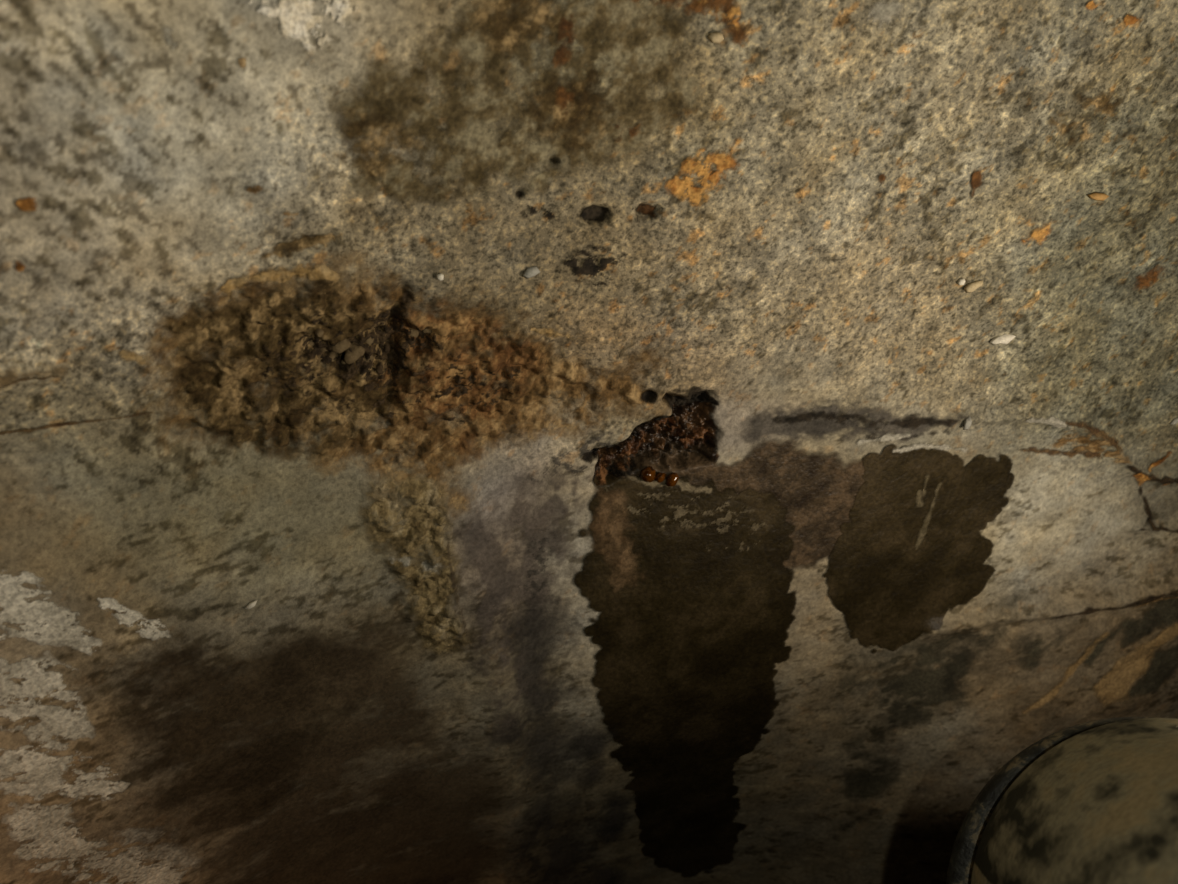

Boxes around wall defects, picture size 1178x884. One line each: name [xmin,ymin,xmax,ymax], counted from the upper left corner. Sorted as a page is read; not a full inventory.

corrosion [657,0,748,44]
damp [248,0,697,201]
damp [525,205,557,219]
corrosion [666,140,741,206]
damp [558,247,627,287]
spalling [120,234,719,511]
crack [1128,452,1178,533]
damp [459,401,1015,884]
damp [0,571,502,884]